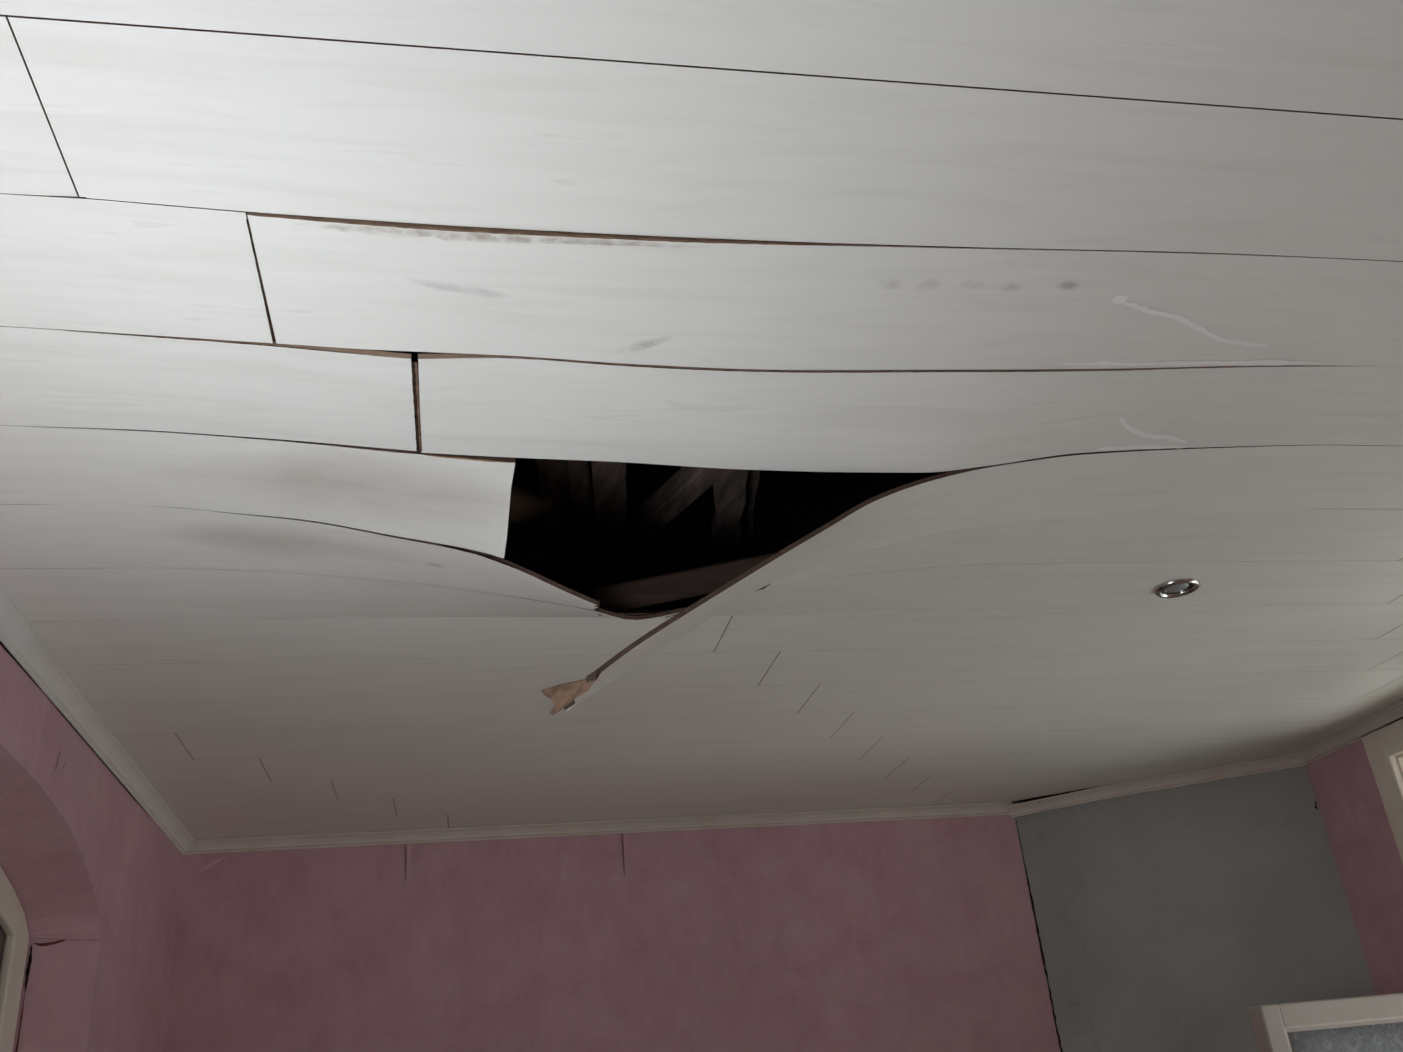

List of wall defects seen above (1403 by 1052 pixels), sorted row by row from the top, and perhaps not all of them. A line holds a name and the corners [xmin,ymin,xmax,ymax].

crack [0,641,146,812]
peeling [541,679,595,715]
crack [15,940,65,1052]